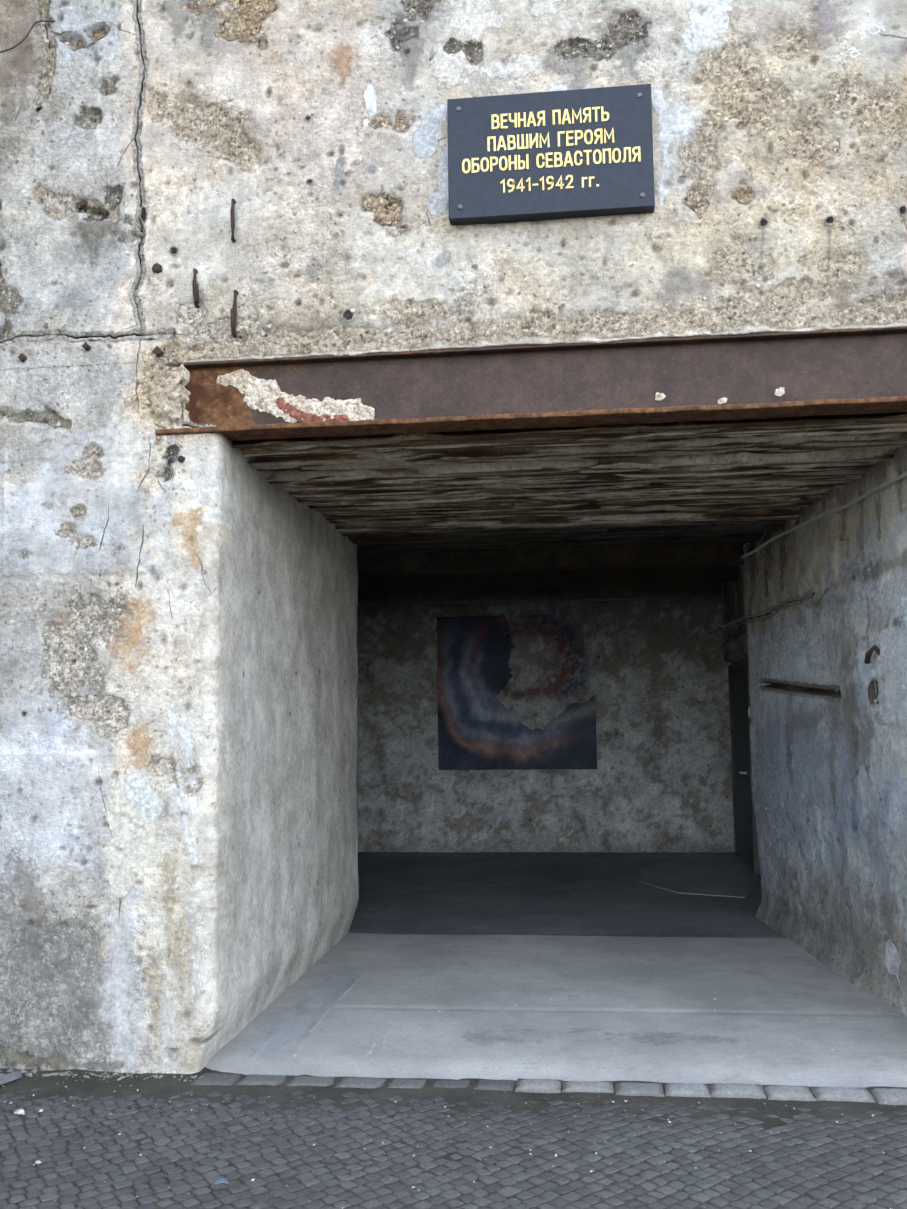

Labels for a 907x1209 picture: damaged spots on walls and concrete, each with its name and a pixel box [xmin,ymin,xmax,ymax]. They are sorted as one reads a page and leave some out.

spalling [181,0,278,51]
spalling [378,0,441,57]
spalling [429,37,483,66]
spalling [554,9,652,60]
spalling [146,88,274,173]
spalling [361,185,411,237]
crack [0,0,188,493]
spalling [117,240,907,429]
corrosion [185,381,232,425]
spalling [31,593,132,738]